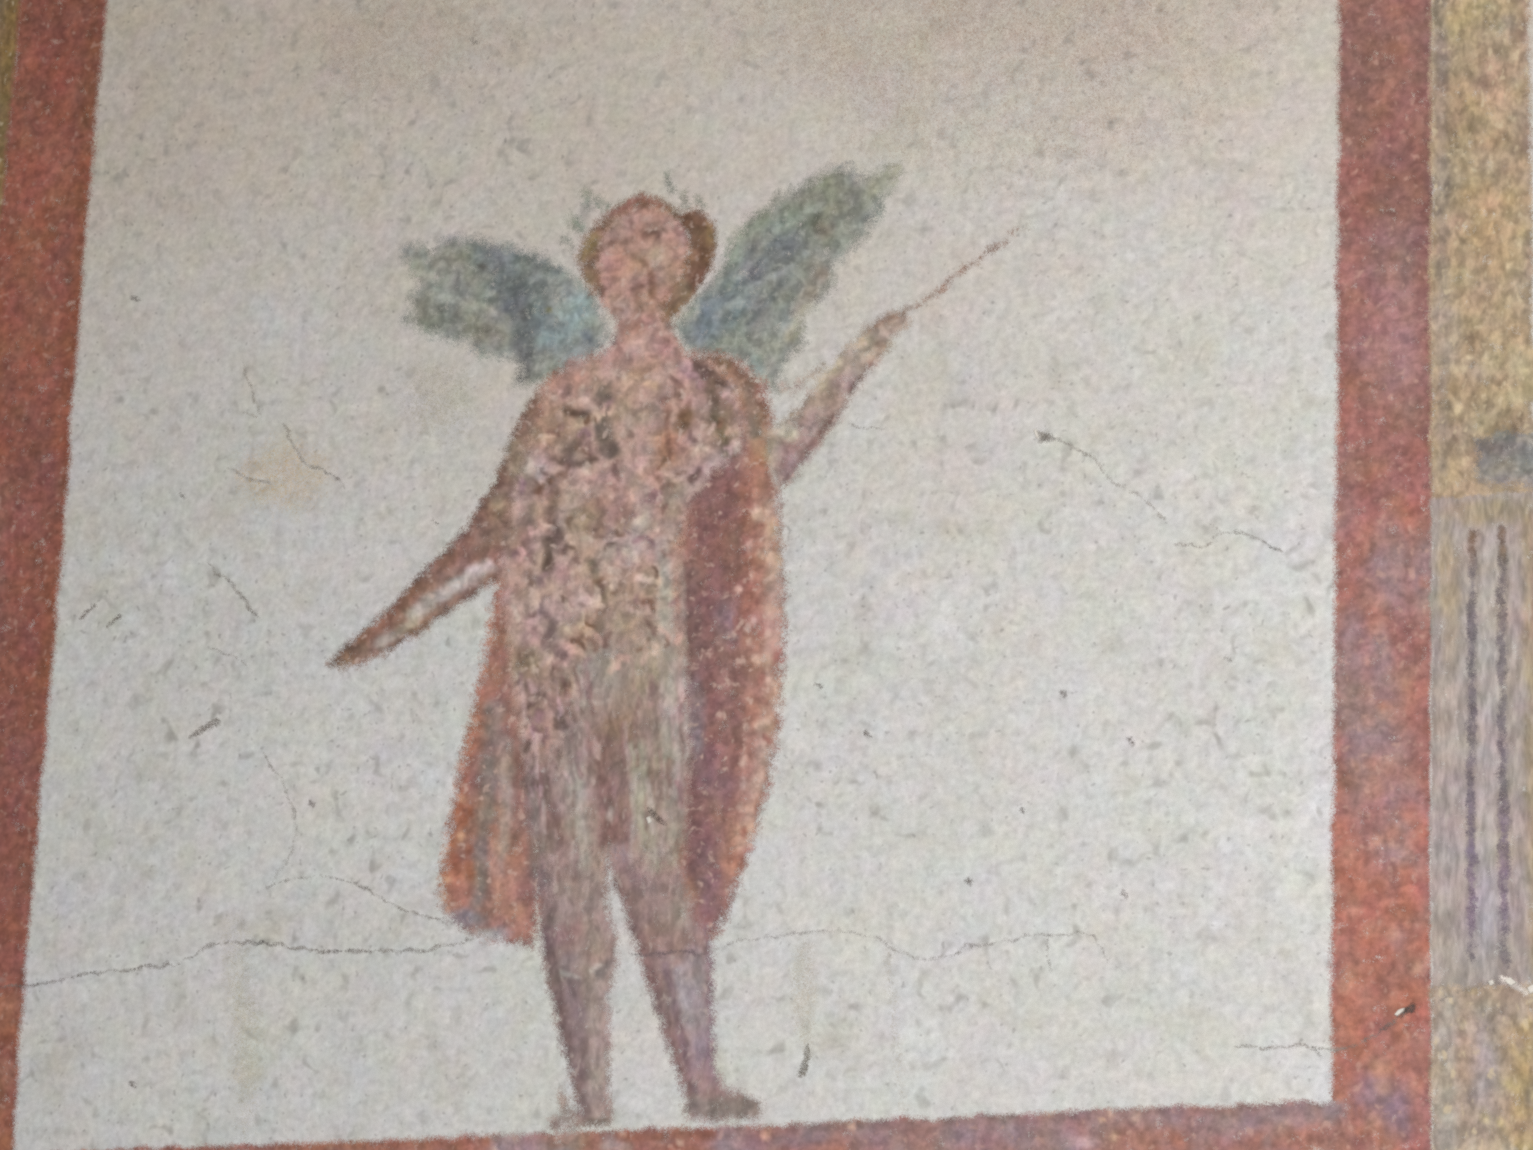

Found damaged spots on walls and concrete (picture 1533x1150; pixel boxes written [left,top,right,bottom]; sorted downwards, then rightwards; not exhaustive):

crack [1057,437,1282,552]
crack [631,929,1119,972]